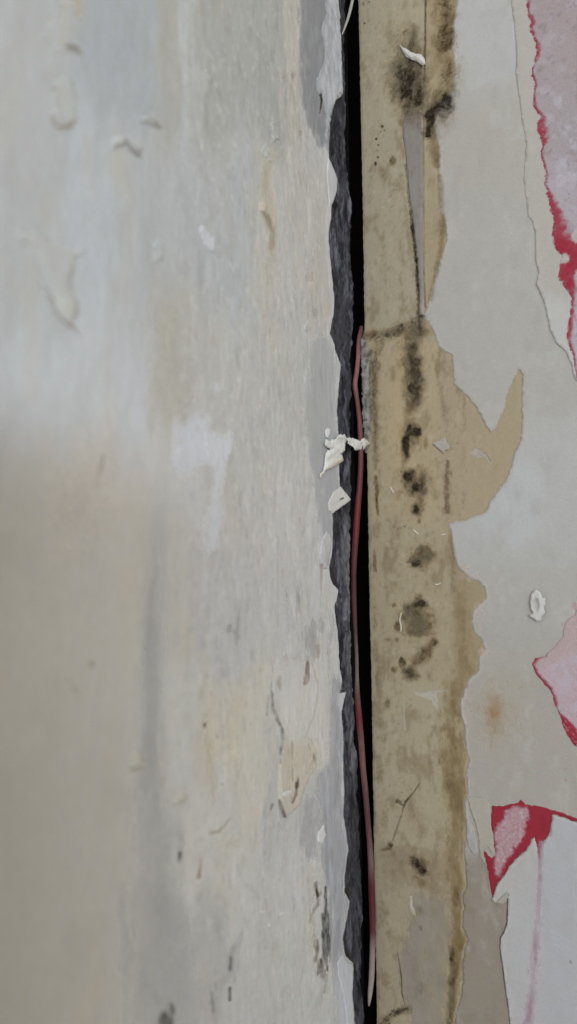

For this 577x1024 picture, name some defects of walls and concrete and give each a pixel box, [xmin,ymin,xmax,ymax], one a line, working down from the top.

leakage [388,0,459,168]
leakage [364,125,428,523]
spalling [270,0,377,1024]
leakage [387,595,438,681]
leakage [407,545,435,571]
leakage [443,460,452,514]
leakage [410,856,427,885]
leakage [439,638,472,1024]